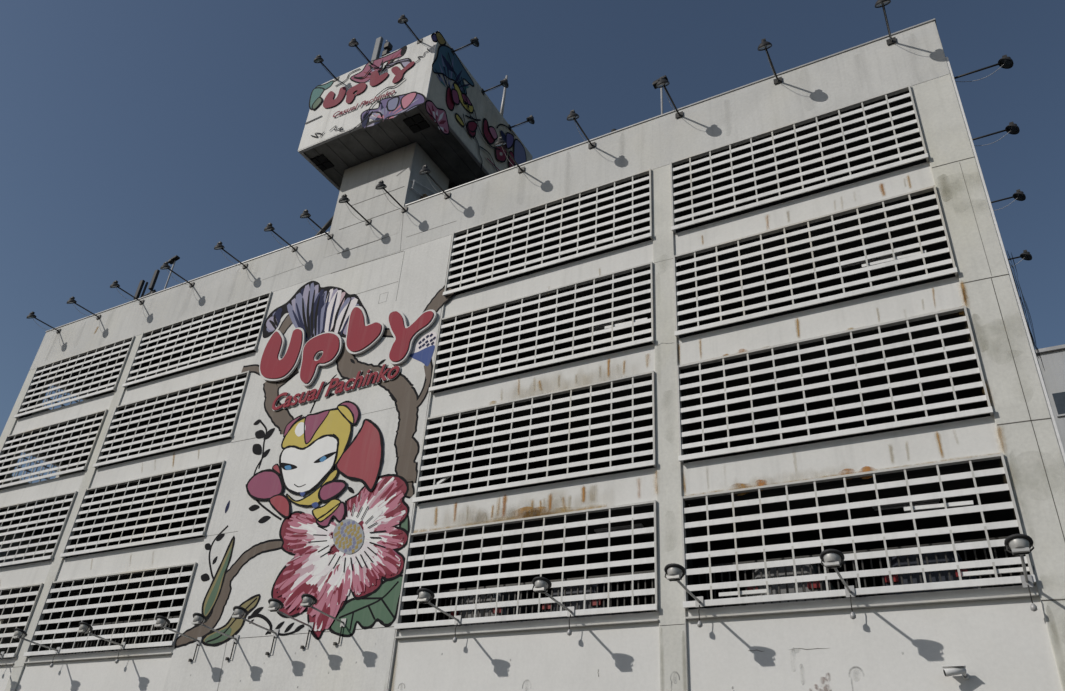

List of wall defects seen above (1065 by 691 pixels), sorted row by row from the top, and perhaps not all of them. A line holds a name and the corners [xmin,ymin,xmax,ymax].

corrosion [470,487,601,525]